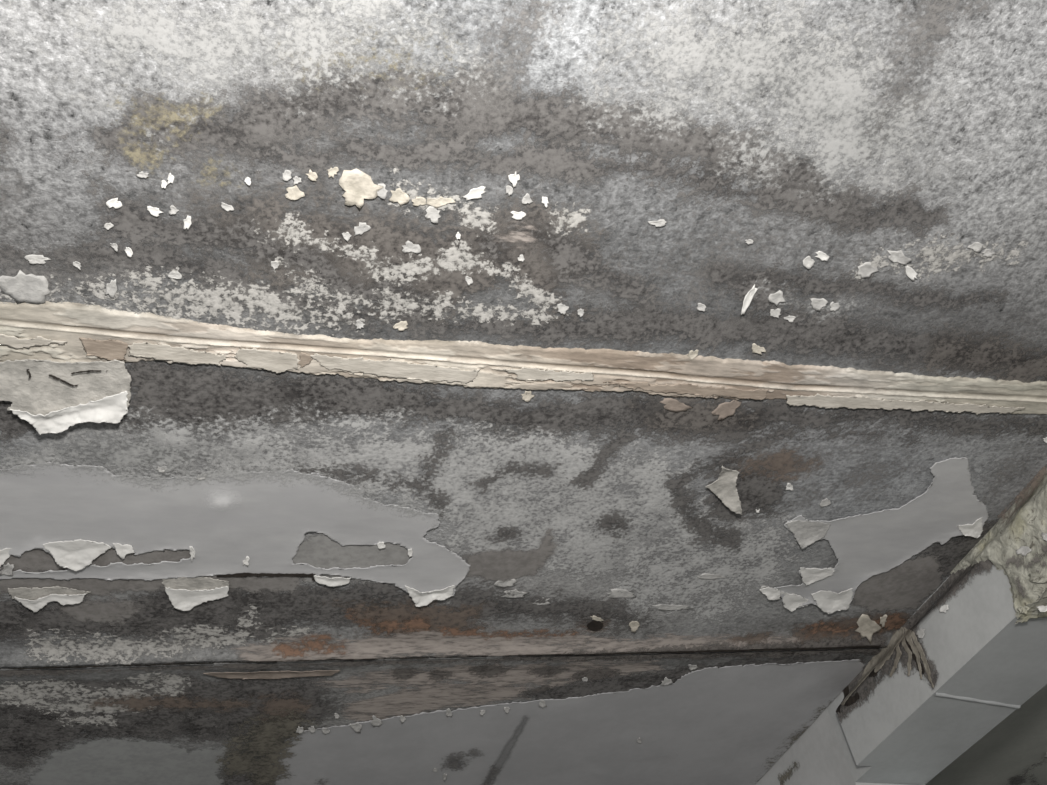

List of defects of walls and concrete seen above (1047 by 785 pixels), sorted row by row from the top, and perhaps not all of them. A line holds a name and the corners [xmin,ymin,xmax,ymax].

peeling [282,167,486,242]
damp [0,0,1047,383]
peeling [506,172,549,220]
peeling [0,254,51,304]
peeling [786,393,1025,415]
peeling [0,334,556,625]
damp [0,360,1047,648]
corrosion [336,600,485,637]
peeling [203,457,1047,785]
damp [518,651,865,700]
damp [0,672,347,785]
mould [433,749,481,781]